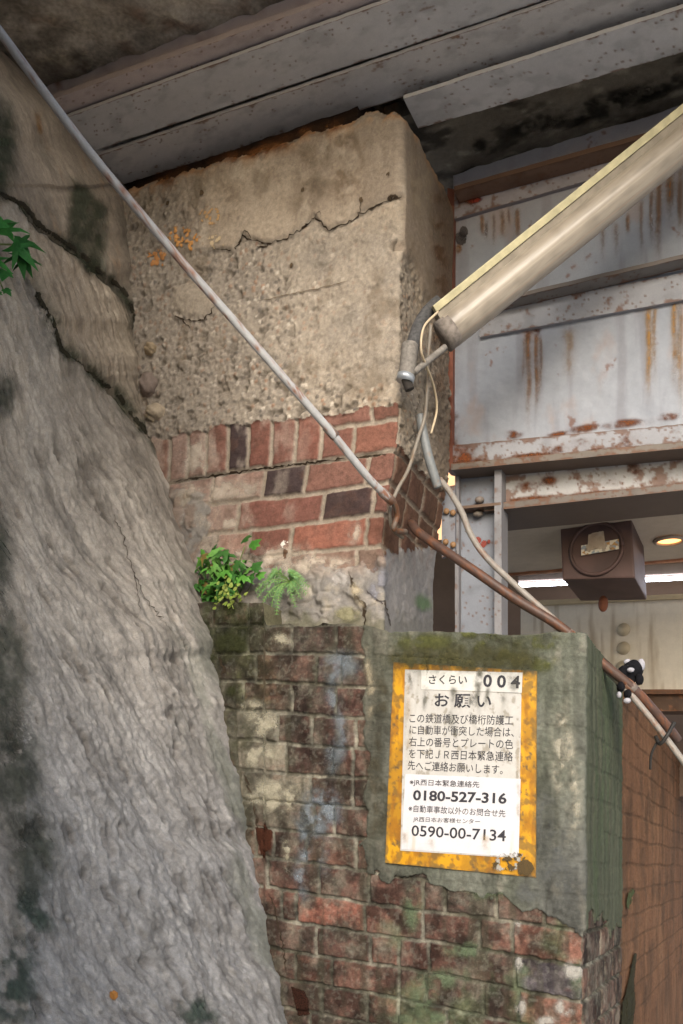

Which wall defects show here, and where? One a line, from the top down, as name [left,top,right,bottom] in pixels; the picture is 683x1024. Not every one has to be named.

water stain [575,77,679,124]
water stain [69,182,107,275]
spalling [145,207,224,266]
crack [207,197,401,252]
corrosion [650,176,682,232]
corrosion [526,329,542,395]
corrosion [646,310,655,371]
corrosion [672,304,682,365]
corrosion [453,447,481,463]
corrosion [517,424,598,457]
corrosion [616,419,639,443]
corrosion [510,477,556,501]